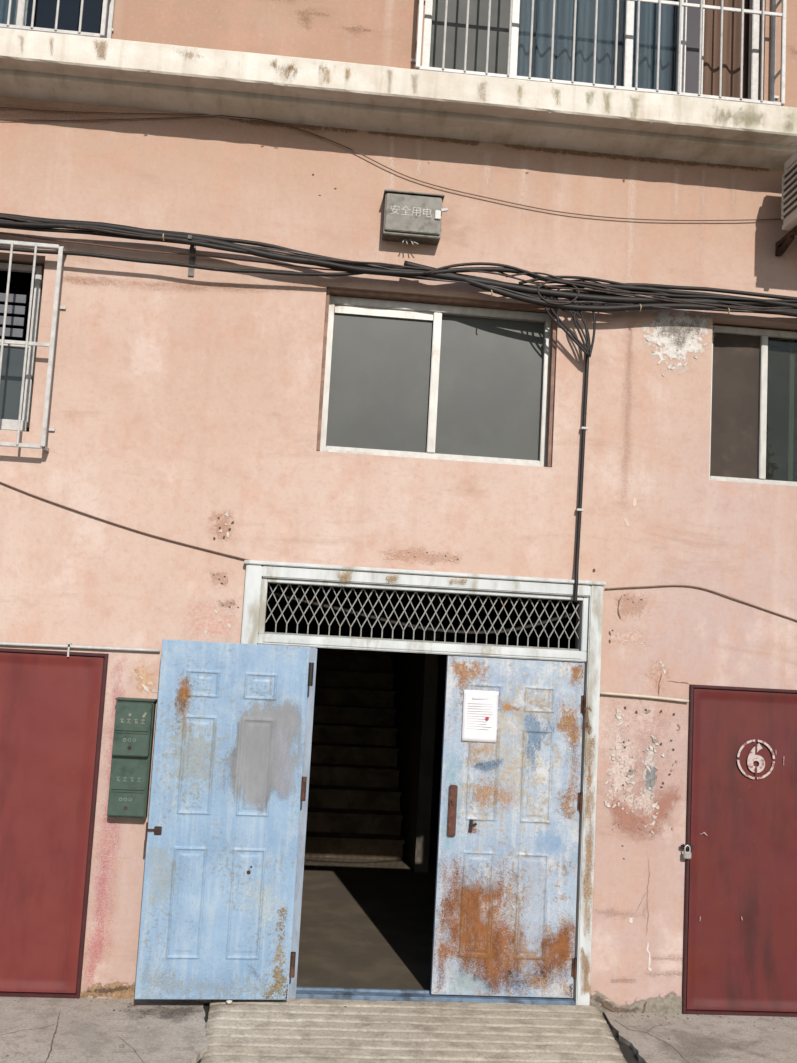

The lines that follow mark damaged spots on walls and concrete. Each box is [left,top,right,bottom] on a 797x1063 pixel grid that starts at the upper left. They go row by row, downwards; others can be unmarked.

damp [709,100,768,129]
peeling [642,309,713,376]
spalling [209,510,234,541]
corrosion [174,676,192,715]
corrosion [448,656,493,707]
corrosion [564,663,584,691]
peeling [598,660,687,859]
corrosion [432,700,596,998]
crack [636,861,650,934]
corrosion [262,908,288,1000]